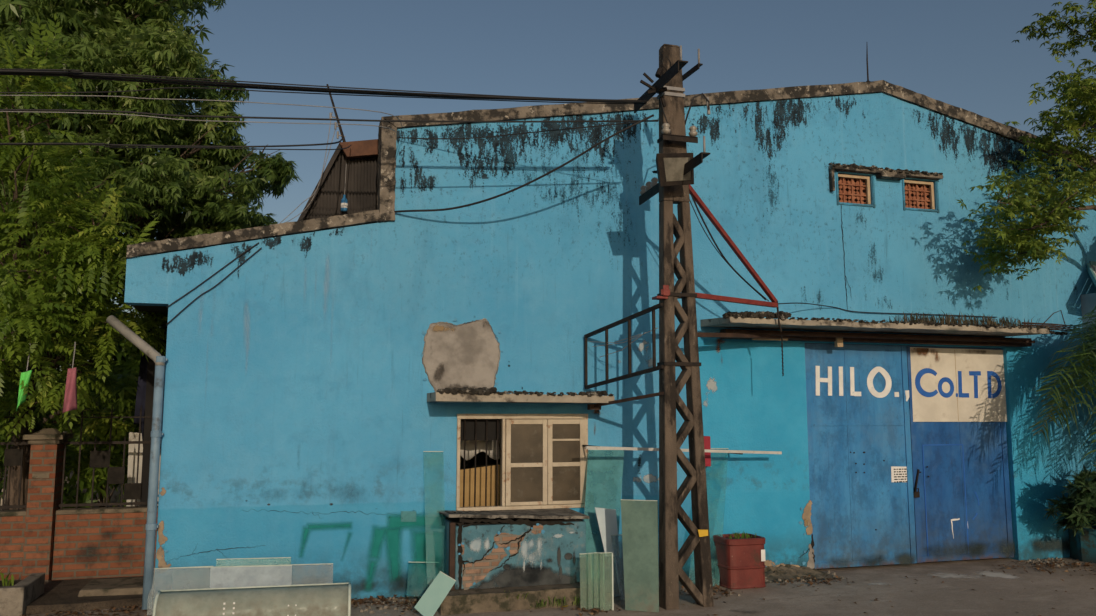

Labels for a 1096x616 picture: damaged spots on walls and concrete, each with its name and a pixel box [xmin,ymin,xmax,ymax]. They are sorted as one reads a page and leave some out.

water stain [829,96,865,121]
water stain [397,112,659,245]
water stain [686,97,819,217]
water stain [162,251,212,276]
water stain [231,231,315,277]
flaking render [421,316,510,392]
peeling [156,521,171,573]
flaking render [458,523,545,590]